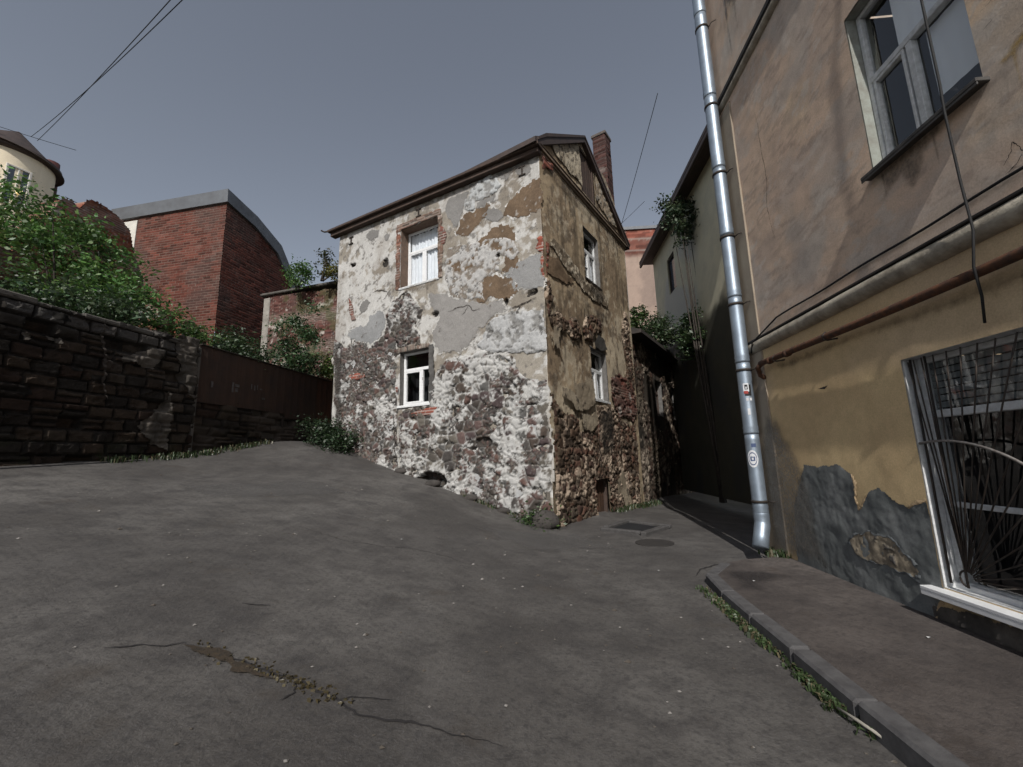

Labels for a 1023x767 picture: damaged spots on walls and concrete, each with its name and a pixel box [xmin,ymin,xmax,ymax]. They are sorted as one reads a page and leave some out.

spalling [331,144,641,527]
spalling [849,530,921,584]
spalling [932,603,1023,653]